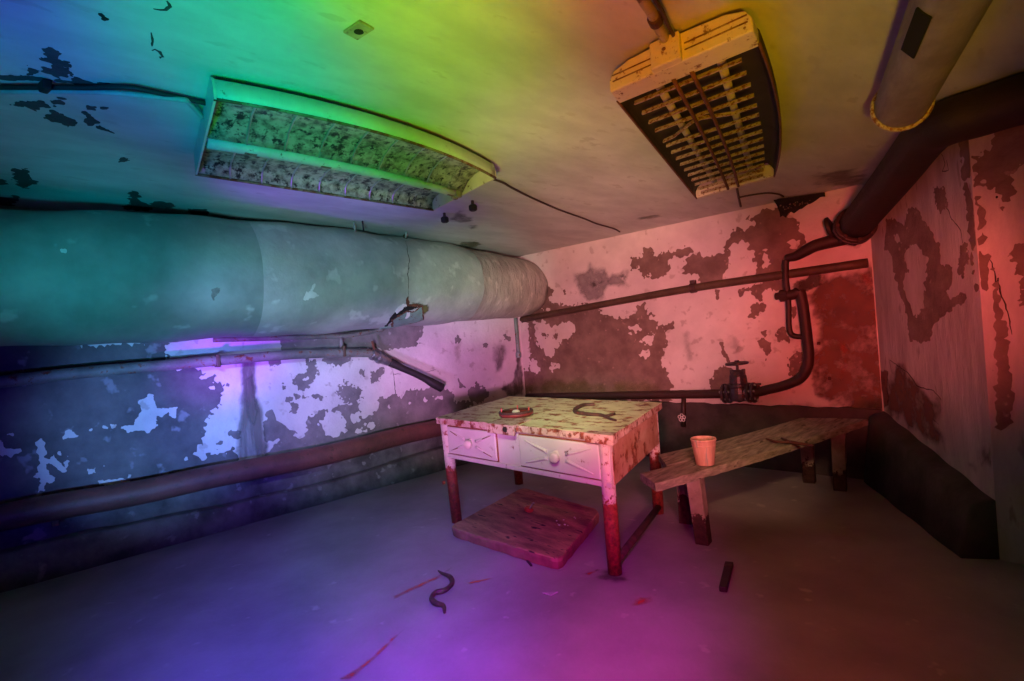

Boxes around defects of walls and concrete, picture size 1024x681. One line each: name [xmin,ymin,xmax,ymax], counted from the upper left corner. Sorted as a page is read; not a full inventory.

peeling [0,47,110,85]
peeling [10,97,115,134]
peeling [0,168,39,206]
peeling [630,192,825,319]
peeling [884,125,1024,431]
peeling [0,343,240,504]
damp [239,362,267,459]
peeling [522,287,675,402]
peeling [709,342,732,390]
peeling [757,306,802,376]